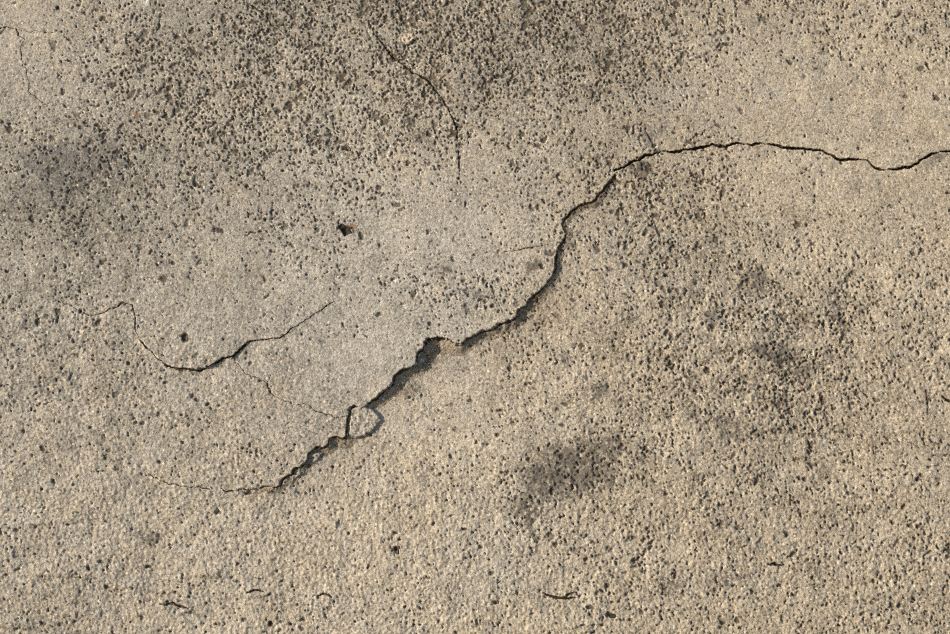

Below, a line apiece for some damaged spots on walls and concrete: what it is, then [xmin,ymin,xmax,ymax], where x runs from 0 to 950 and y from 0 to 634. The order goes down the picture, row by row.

crack [368,23,460,179]
crack [614,129,950,171]
crack [58,301,344,418]